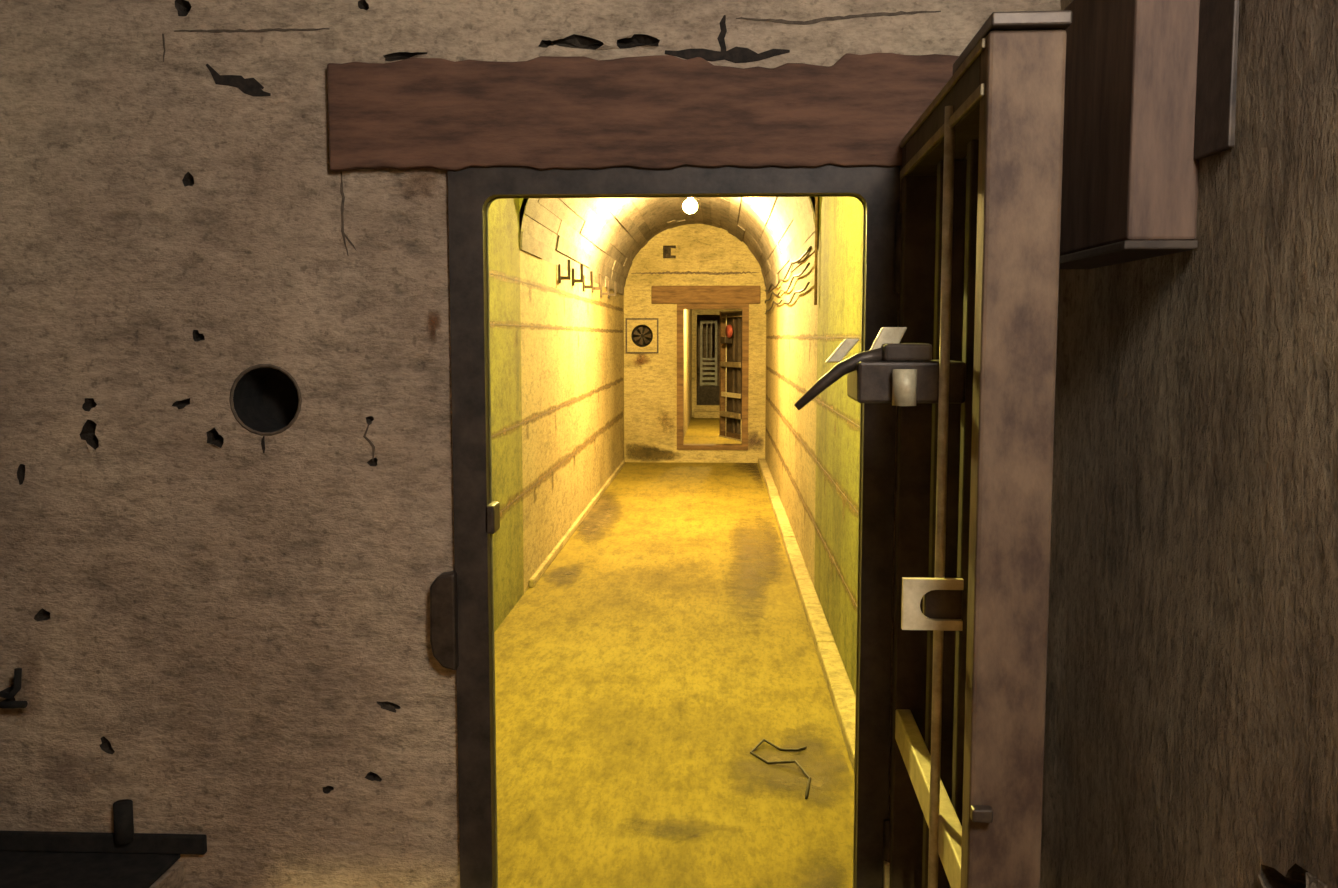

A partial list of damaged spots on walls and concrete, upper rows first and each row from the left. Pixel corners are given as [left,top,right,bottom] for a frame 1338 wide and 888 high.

spalling [539,34,660,50]
spalling [1258,863,1327,888]